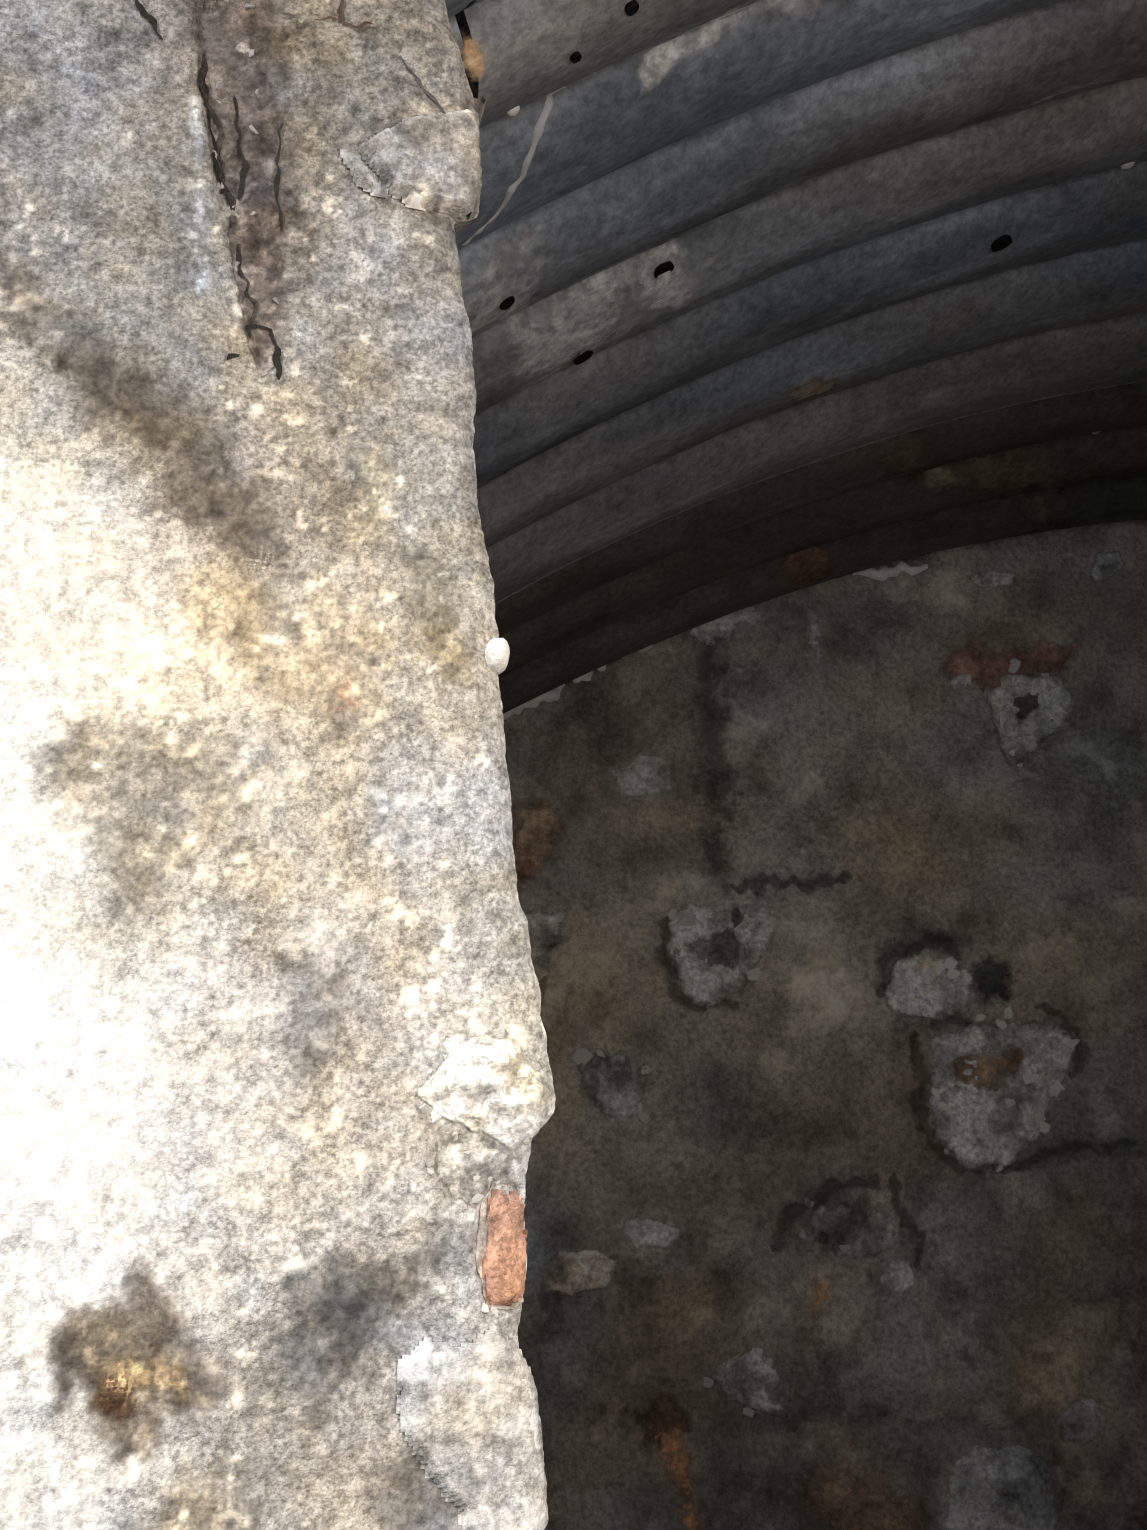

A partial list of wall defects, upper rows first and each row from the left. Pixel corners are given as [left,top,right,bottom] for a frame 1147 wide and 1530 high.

water stain [190,97,207,294]
crack [135,0,283,381]
spalling [944,635,1078,775]
corrosion [512,806,556,888]
spalling [665,894,777,1008]
spalling [571,1048,652,1123]
spalling [885,954,1080,1172]
corrosion [624,1392,700,1530]
spalling [944,1445,1058,1530]